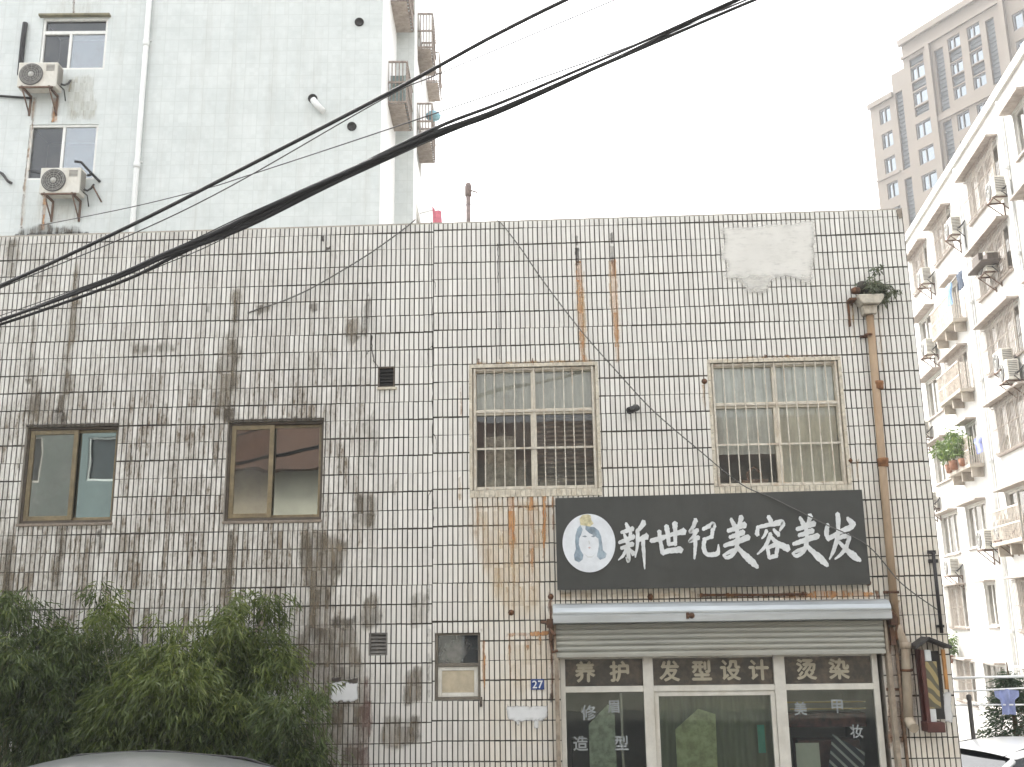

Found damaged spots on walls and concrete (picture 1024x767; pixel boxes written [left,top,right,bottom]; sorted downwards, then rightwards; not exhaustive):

corrosion [575,236,584,314]
leakage [216,339,240,423]
leakage [353,495,374,526]
corrosion [508,496,553,565]
leakage [290,532,376,767]
corrosion [528,601,554,664]
leakage [404,668,429,703]
leakage [382,716,419,748]